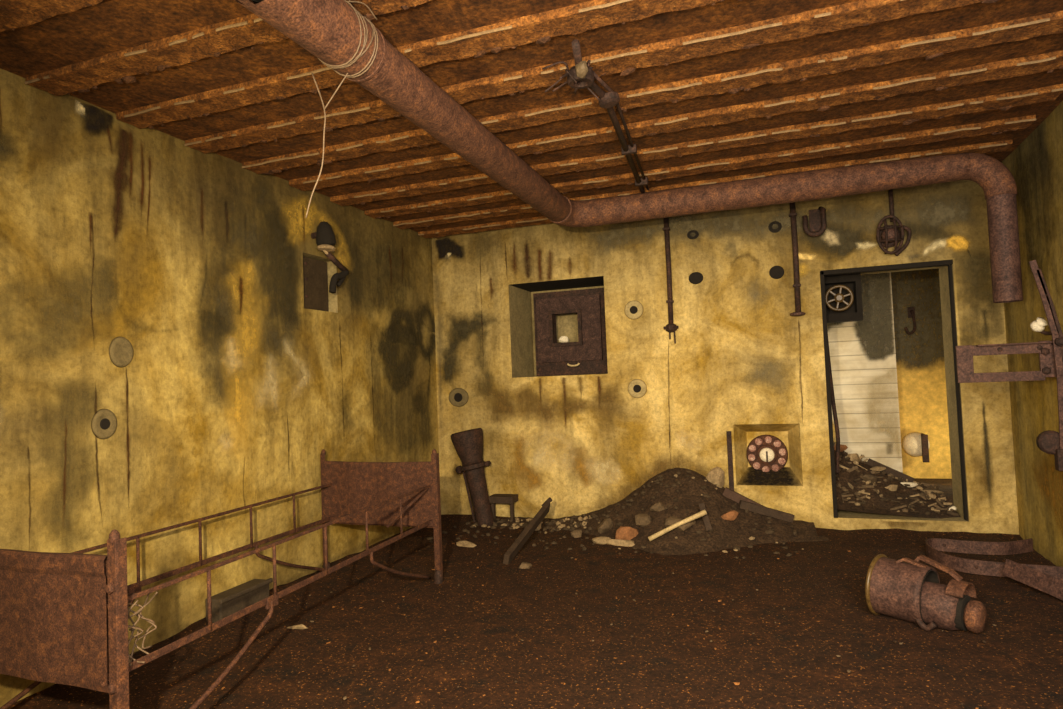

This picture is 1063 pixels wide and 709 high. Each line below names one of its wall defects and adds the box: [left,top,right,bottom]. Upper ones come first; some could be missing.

leakage [579,0,633,13]
leakage [437,25,512,45]
leakage [287,67,332,80]
leakage [349,249,618,450]
leakage [517,443,540,487]